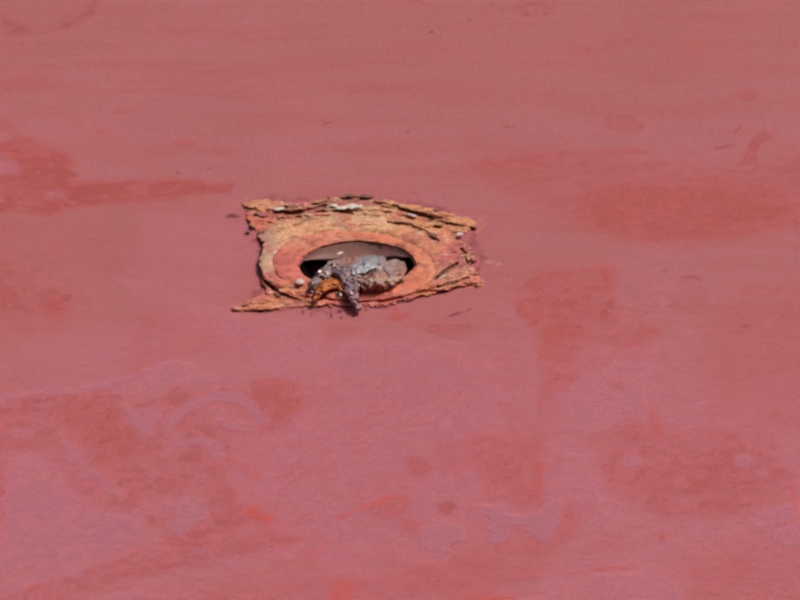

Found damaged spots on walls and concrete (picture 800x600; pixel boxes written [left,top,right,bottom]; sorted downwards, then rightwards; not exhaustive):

spalling [232,194,485,313]